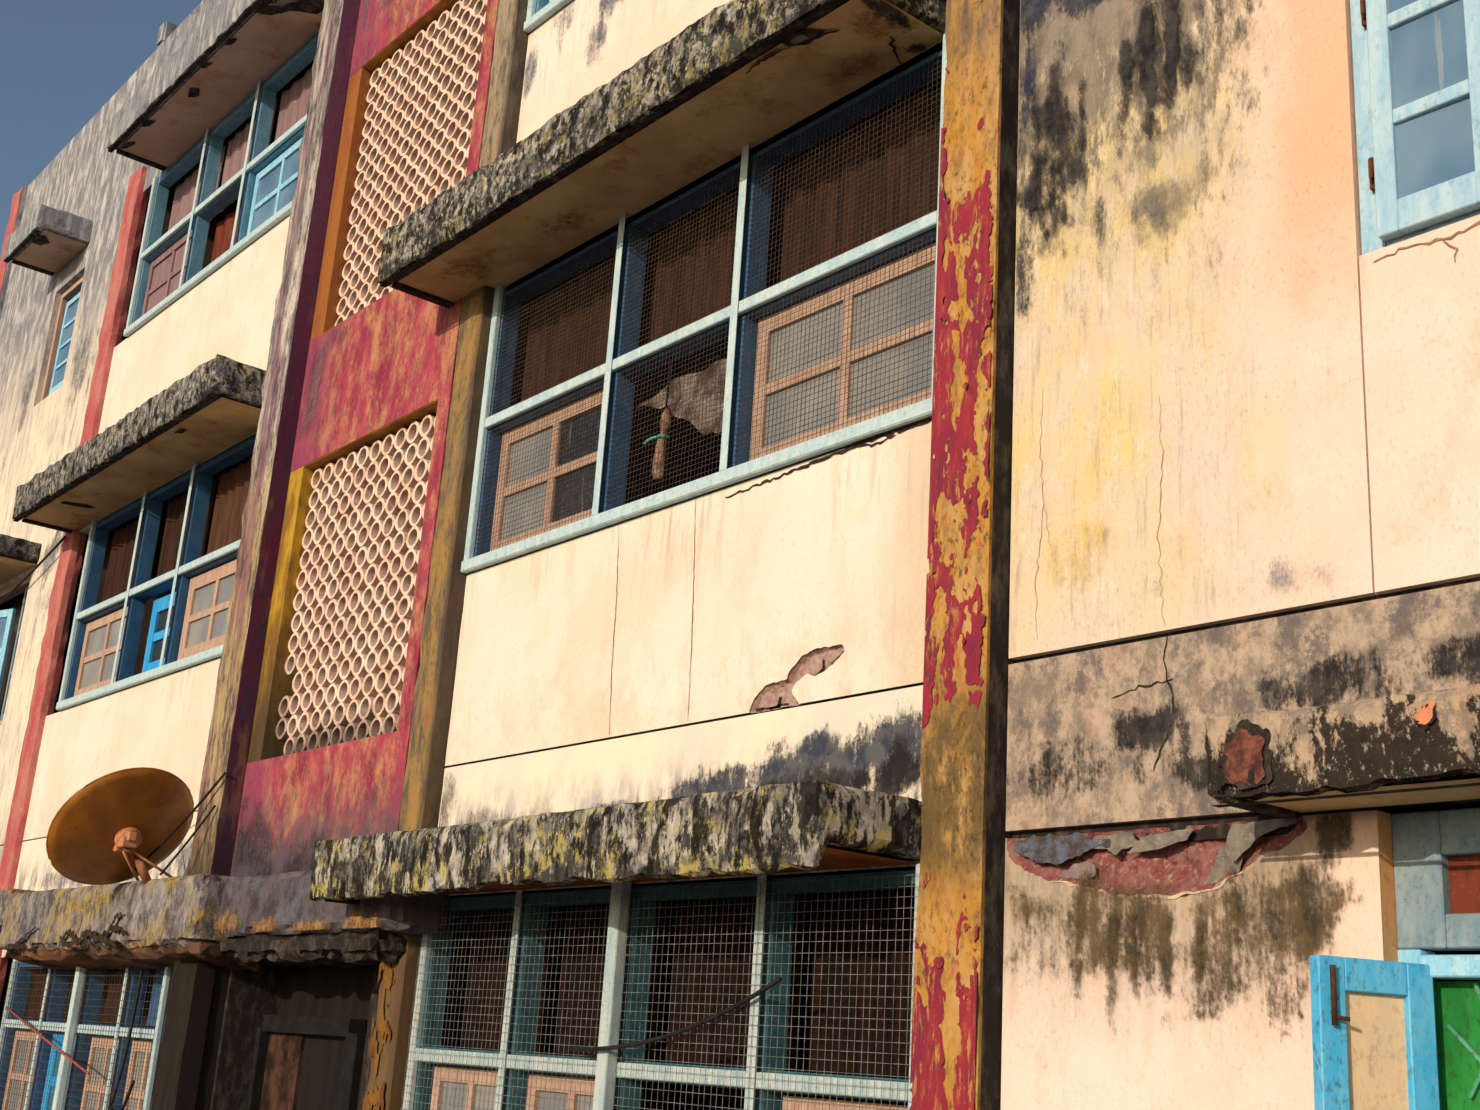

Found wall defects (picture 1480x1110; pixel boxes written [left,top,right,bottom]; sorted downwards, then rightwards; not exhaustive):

water stain [1117,0,1252,155]
water stain [1016,0,1104,313]
crack [1374,220,1480,262]
peeling [922,127,994,728]
crack [1111,402,1174,771]
flaking render [749,644,845,713]
water stain [761,734,920,799]
water stain [1007,701,1208,799]
spalling [1213,719,1272,790]
flaking render [1007,817,1308,900]
water stain [1011,813,1360,1034]
peeling [909,893,978,1110]